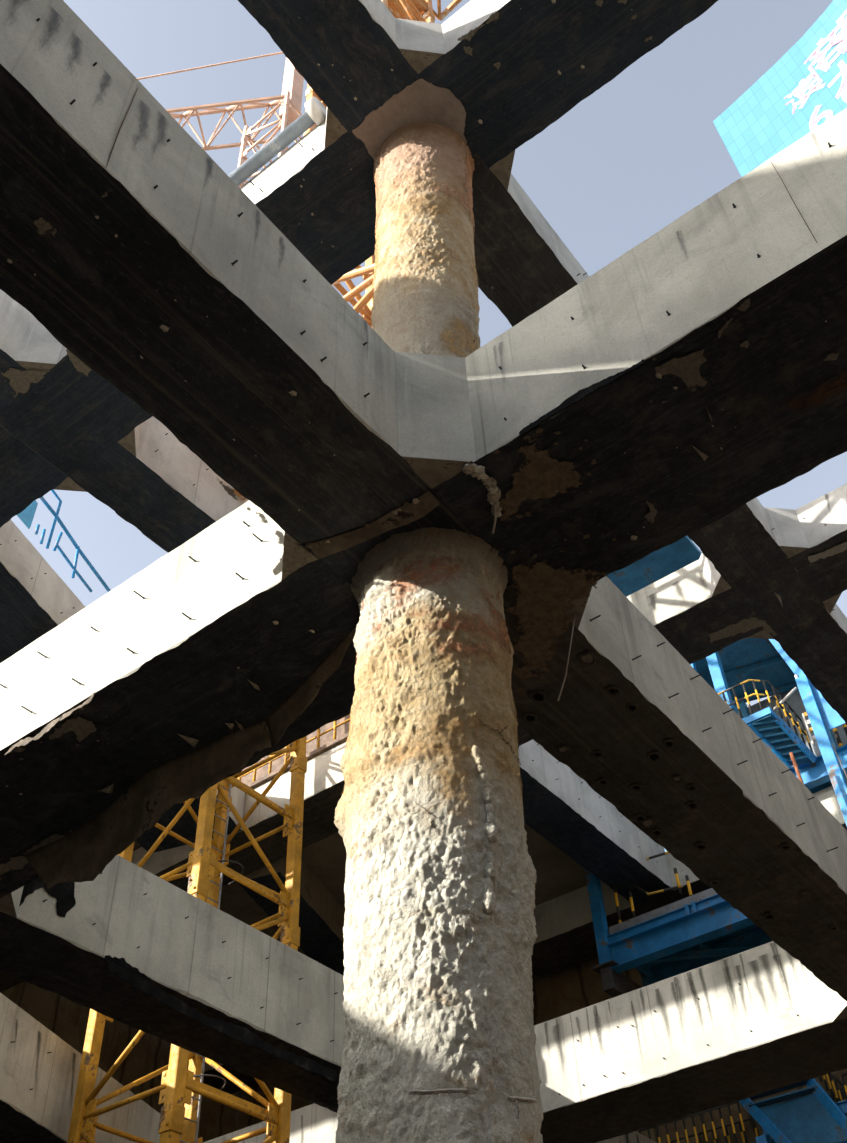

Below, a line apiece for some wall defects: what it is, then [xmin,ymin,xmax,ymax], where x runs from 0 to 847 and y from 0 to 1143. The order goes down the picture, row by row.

peeling [0,368,50,397]
peeling [653,349,719,391]
peeling [462,428,597,534]
rust [397,557,460,599]
peeling [808,542,847,563]
peeling [504,550,617,691]
damp [656,968,706,1023]
damp [724,942,792,996]